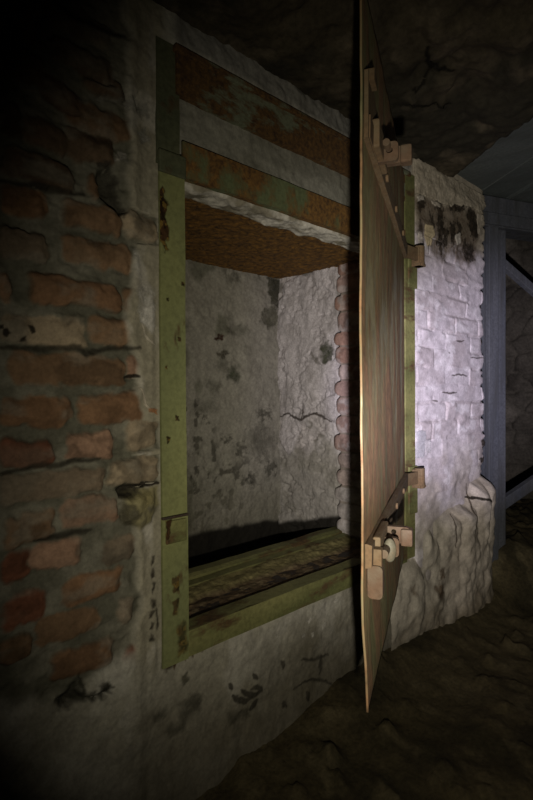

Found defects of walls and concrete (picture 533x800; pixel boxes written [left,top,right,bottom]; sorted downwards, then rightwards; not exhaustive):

corrosion [160,187,169,250]
leakage [417,194,478,263]
crack [280,409,332,422]
crack [450,490,492,547]